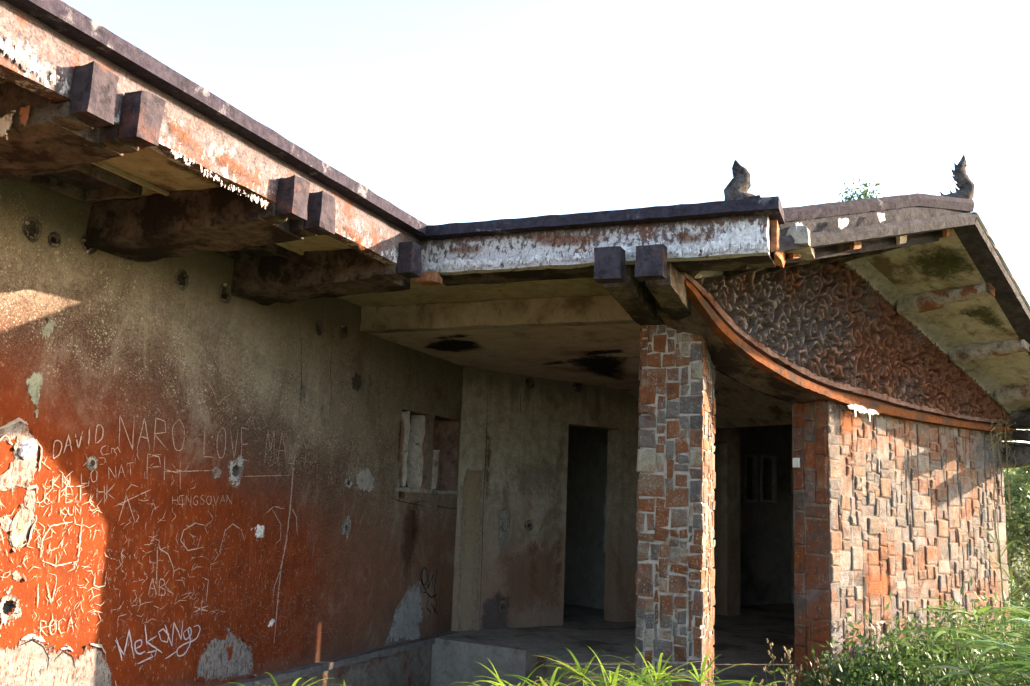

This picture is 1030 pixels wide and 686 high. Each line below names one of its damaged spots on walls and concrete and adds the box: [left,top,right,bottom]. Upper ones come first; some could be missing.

peeling [0,37,64,85]
peeling [0,105,30,140]
corrosion [218,152,241,173]
peeling [610,219,770,258]
peeling [422,249,594,272]
leakage [425,334,480,352]
leakage [544,349,626,380]
peeling [0,372,43,553]
spalling [347,468,375,492]
peeling [0,634,117,686]